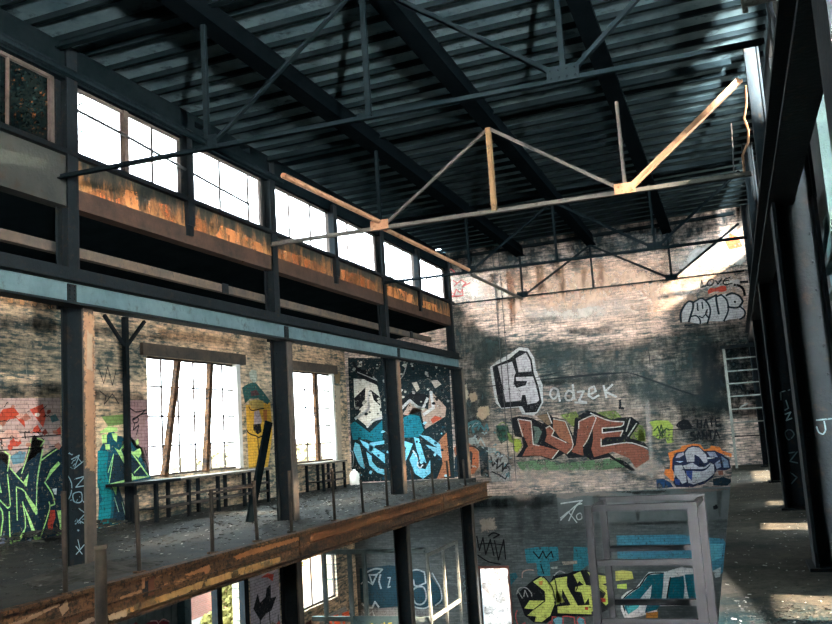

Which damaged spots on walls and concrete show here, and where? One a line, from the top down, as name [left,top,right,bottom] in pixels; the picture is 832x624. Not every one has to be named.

rust [88,189,178,224]
rust [194,218,264,253]
rust [279,250,326,274]
rust [339,270,374,290]
rust [387,286,413,303]
rust [422,300,438,312]